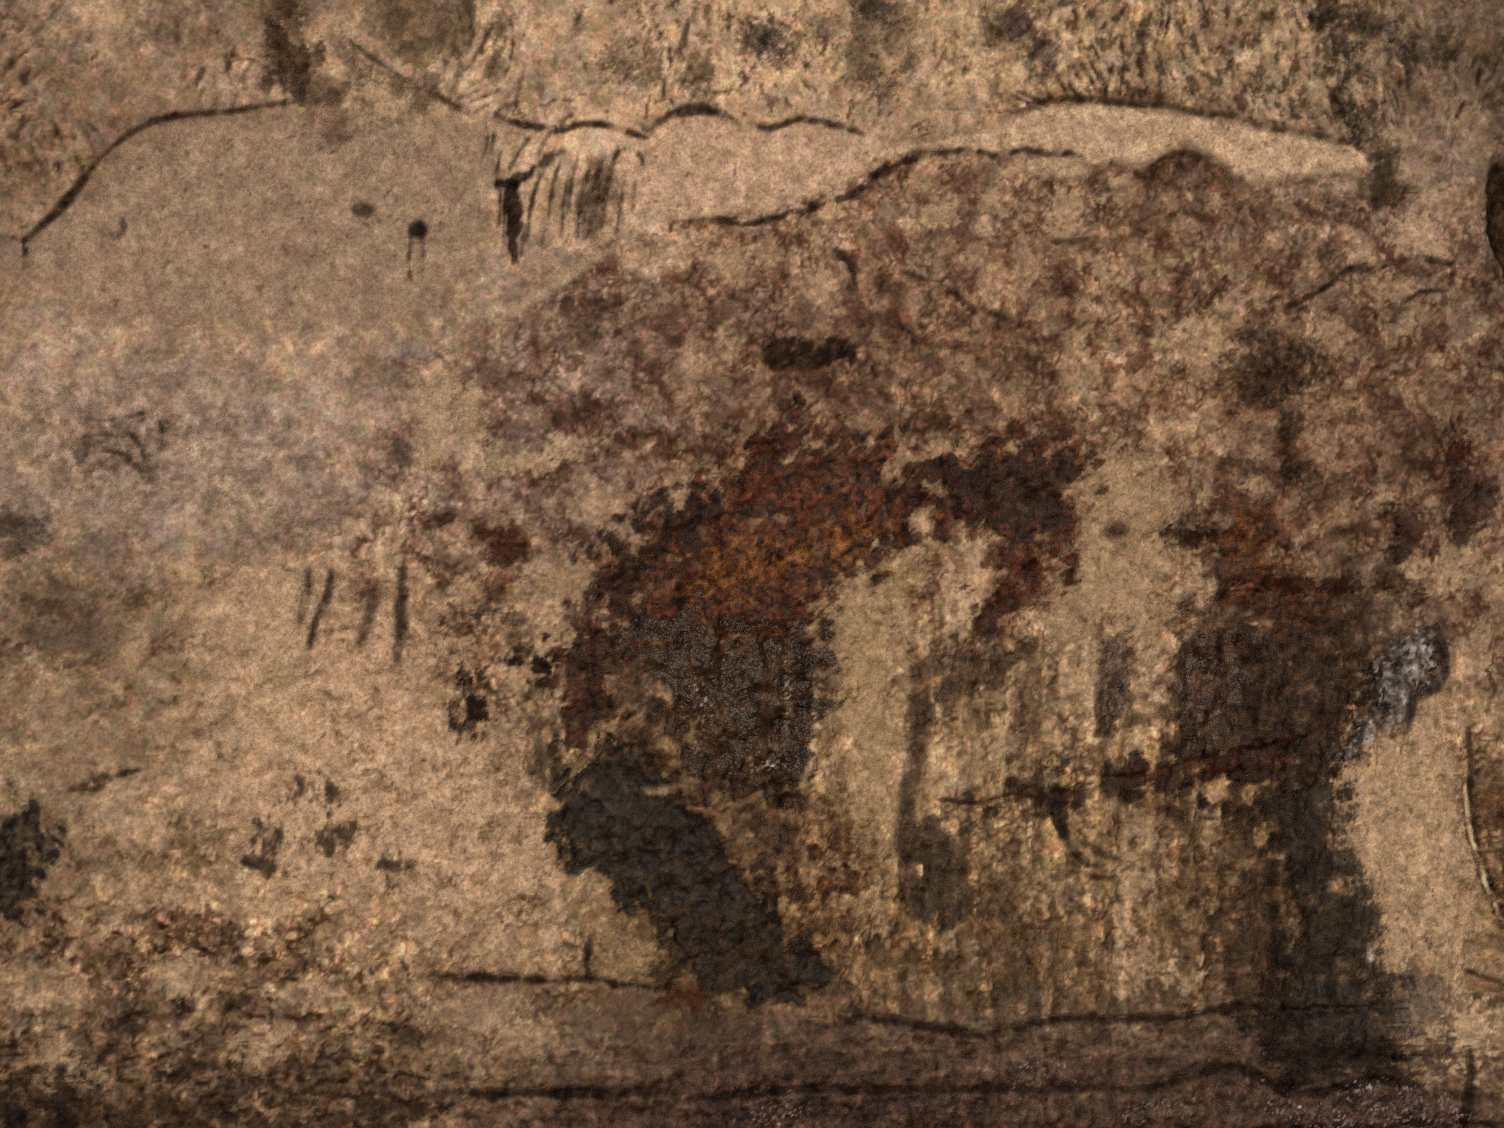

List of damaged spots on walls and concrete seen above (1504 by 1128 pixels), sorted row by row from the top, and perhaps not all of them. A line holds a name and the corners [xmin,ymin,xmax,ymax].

crack [494,100,863,163]
crack [1033,95,1351,144]
crack [10,100,286,255]
crack [689,147,1083,225]
crack [818,247,1027,327]
rust [958,415,1503,833]
water stain [449,696,487,741]
rust [456,387,1110,965]
water stain [241,767,357,879]
water stain [377,849,412,894]
water stain [510,621,1504,1128]
water stain [0,1043,476,1128]